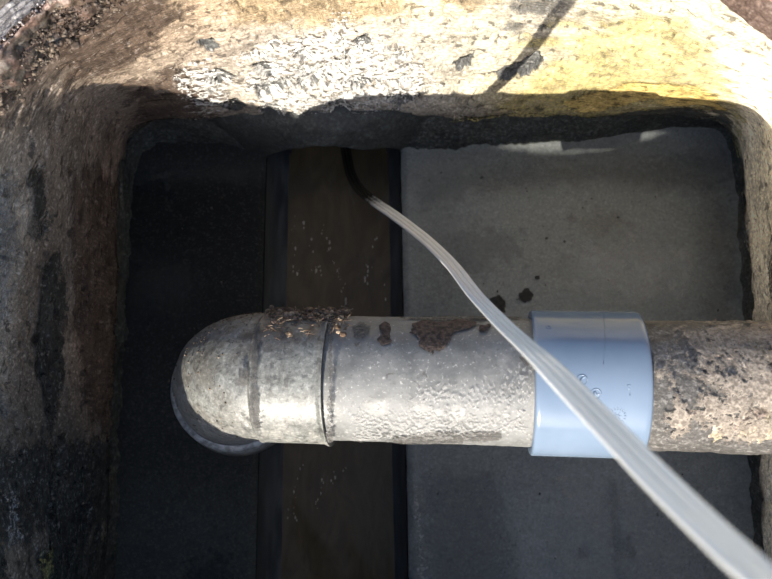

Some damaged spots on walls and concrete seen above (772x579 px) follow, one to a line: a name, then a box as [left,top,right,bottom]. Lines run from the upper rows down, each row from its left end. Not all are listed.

damp [170,12,445,120]
damp [455,0,742,158]
damp [0,162,54,327]
damp [741,179,749,251]
damp [0,246,114,579]